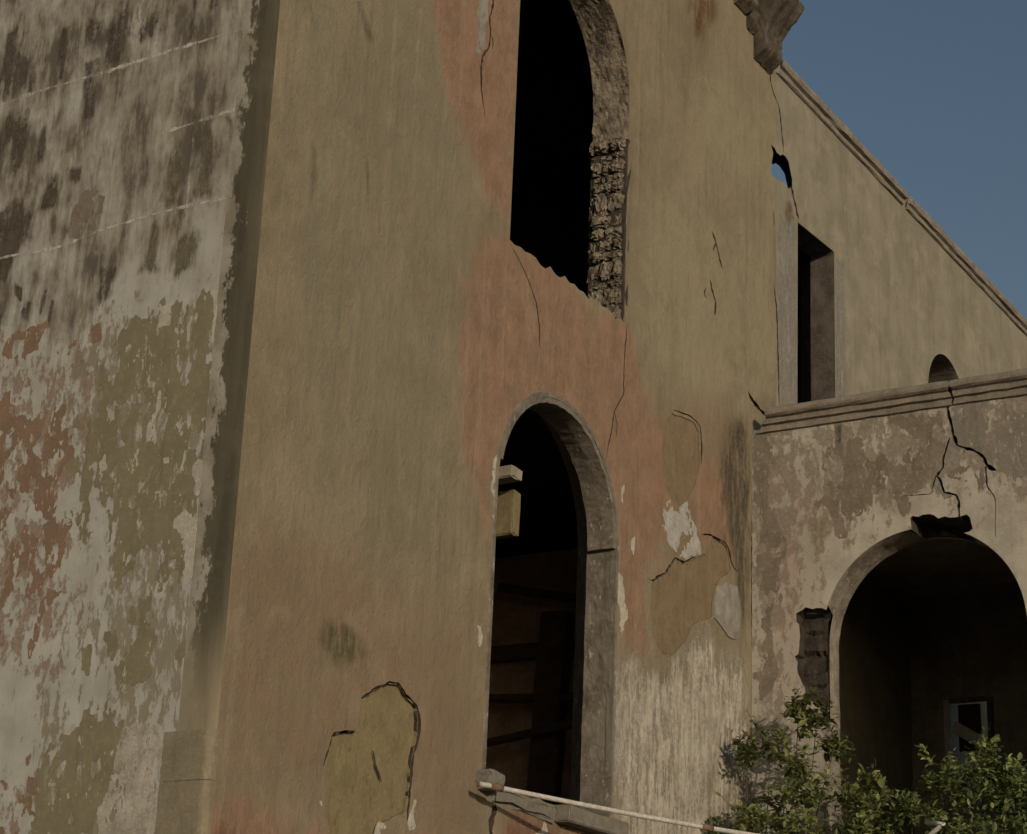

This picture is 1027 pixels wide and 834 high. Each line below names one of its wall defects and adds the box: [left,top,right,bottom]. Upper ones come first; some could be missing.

damp [0,27,32,99]
damp [84,6,158,118]
crack [480,0,494,116]
damp [0,200,53,323]
damp [175,233,198,276]
spalling [586,137,631,320]
crack [606,328,627,456]
peeling [814,410,991,542]
crack [908,407,996,536]
peeling [0,288,217,834]
spalling [795,607,831,718]
crack [488,804,497,834]